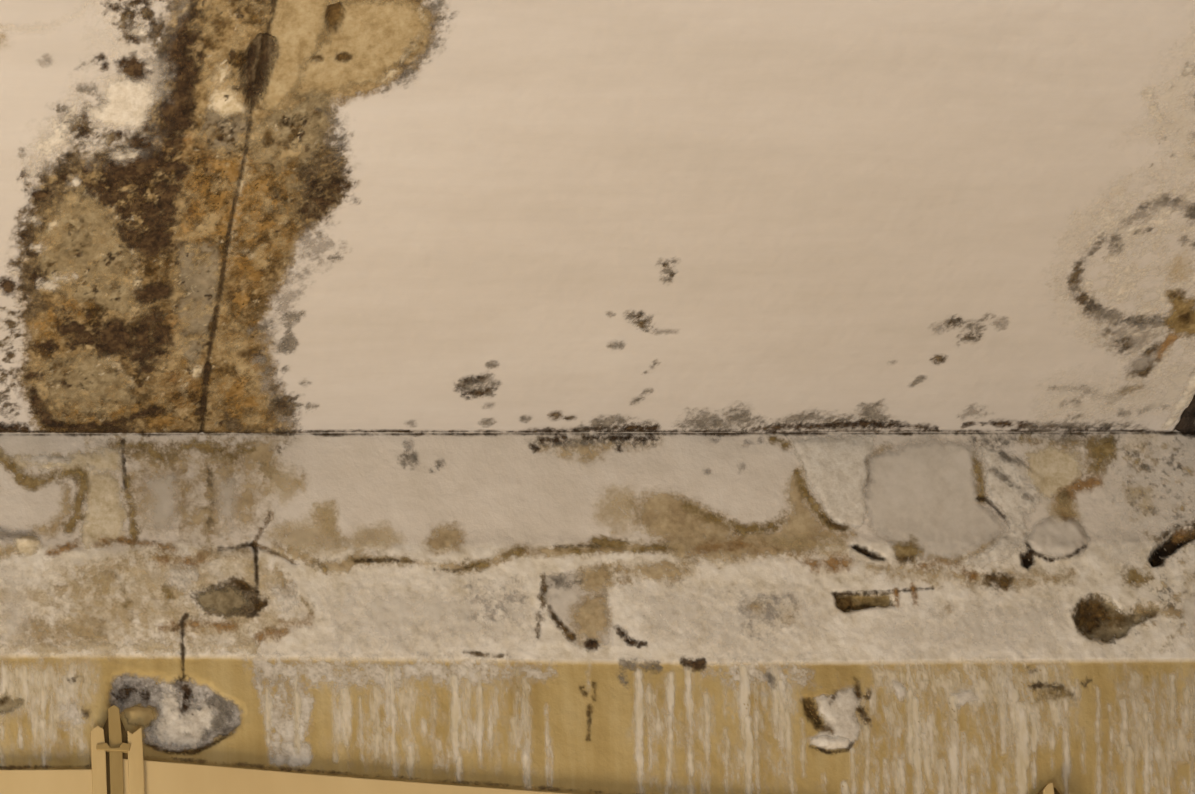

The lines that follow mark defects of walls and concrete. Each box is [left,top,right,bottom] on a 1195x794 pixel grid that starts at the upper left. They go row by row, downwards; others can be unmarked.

crack [0,0,276,546]
water stain [0,0,556,790]
crack [270,428,1177,436]
water stain [962,236,1192,487]
water stain [427,470,855,583]
peeling [790,435,1082,568]
flaking render [1073,594,1182,642]
flaking render [1123,521,1195,587]
flaking render [109,674,240,754]
water stain [619,658,810,794]
flaking render [804,686,870,754]
water stain [842,661,1195,794]